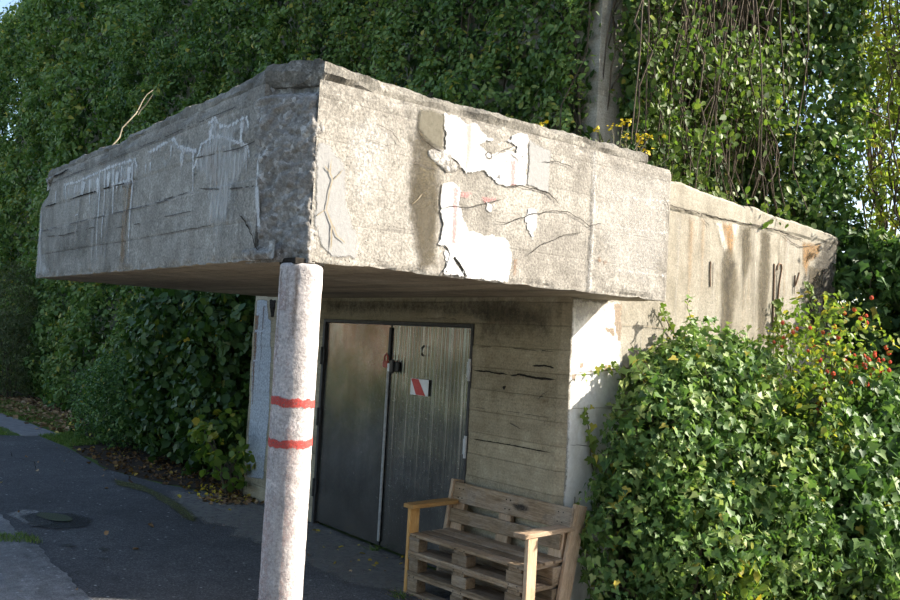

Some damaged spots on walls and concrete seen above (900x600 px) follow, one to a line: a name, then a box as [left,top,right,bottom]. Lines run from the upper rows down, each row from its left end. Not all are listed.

efflorescence [55,116,260,254]
leakage [412,129,437,265]
peeling [428,113,529,282]
crack [446,185,601,255]
peeling [525,209,537,240]
corrosion [717,223,737,256]
corrosion [803,244,820,271]